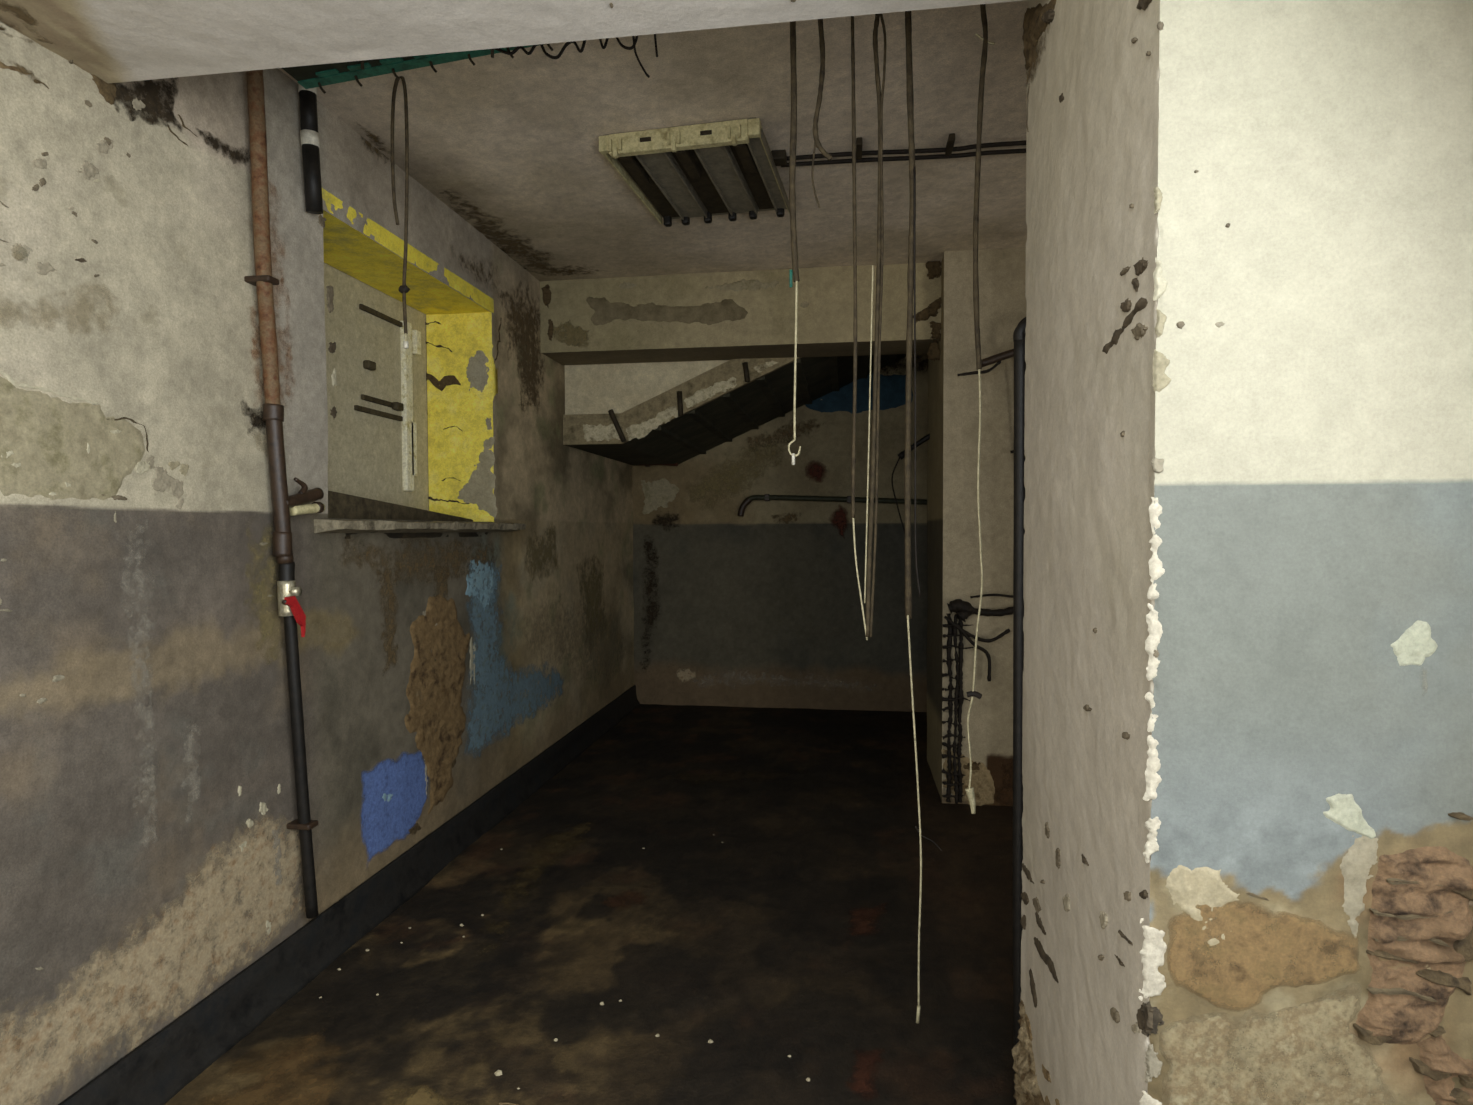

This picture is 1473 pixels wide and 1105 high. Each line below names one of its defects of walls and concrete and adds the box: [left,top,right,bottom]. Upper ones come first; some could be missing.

damp [0,61,49,89]
damp [84,74,250,165]
peeling [0,371,189,523]
peeling [457,418,497,518]
peeling [466,350,489,392]
spalling [1102,257,1185,392]
flaking render [361,560,564,859]
spalling [1122,497,1165,863]
peeling [1391,620,1438,666]
damp [0,784,306,1105]
flaking render [1011,863,1060,1105]
flaking render [1098,794,1473,1105]